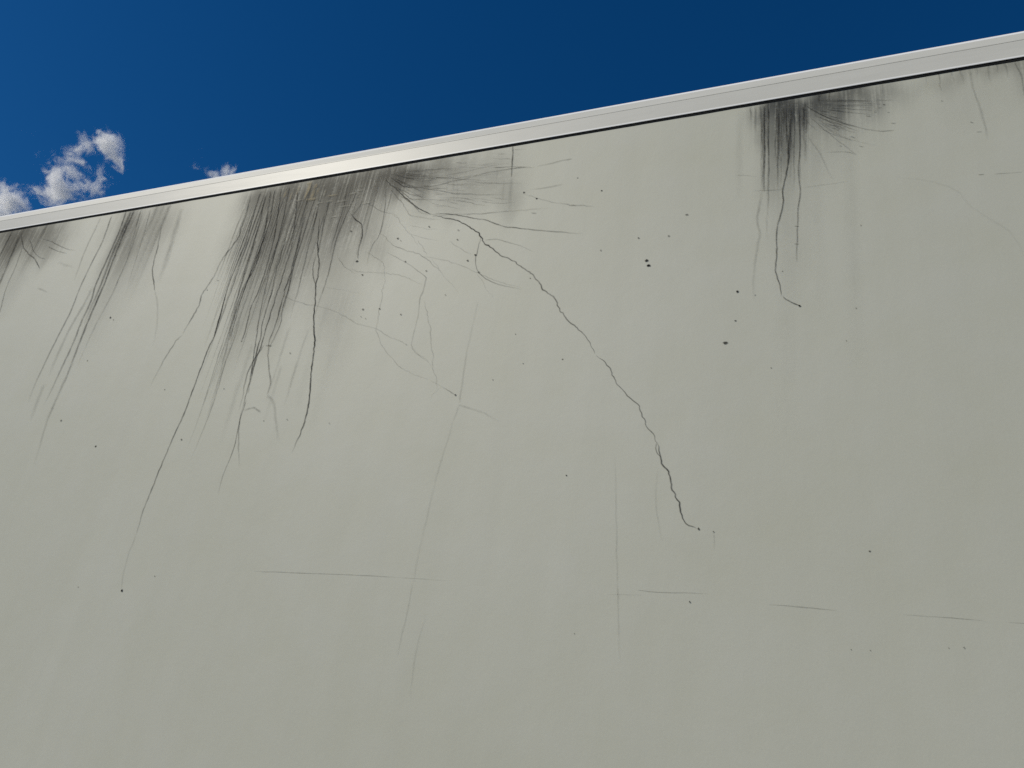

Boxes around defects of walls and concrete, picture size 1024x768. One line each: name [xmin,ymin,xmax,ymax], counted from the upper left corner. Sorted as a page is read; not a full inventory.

water stain [763,94,845,153]
crack [422,210,517,260]
water stain [230,167,411,372]